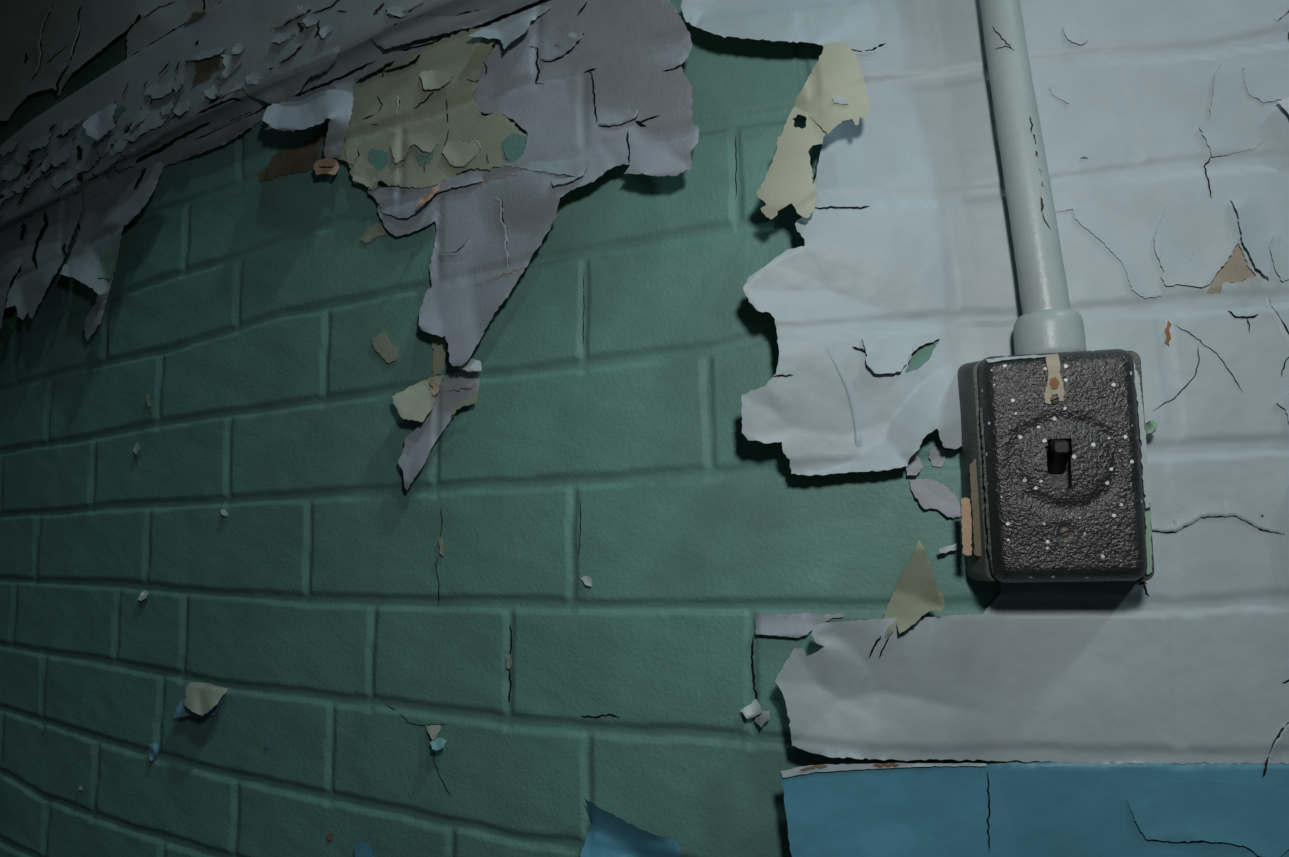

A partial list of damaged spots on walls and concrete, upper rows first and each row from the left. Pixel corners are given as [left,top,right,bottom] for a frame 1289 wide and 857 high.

crack [1030,117,1050,228]
crack [1203,157,1212,196]
peeling [0,0,1023,518]
crack [1152,324,1243,412]
crack [1229,295,1289,377]
peeling [754,0,1289,857]
crack [1151,499,1285,535]
peeling [172,682,228,718]
crack [1263,722,1289,777]
peeling [580,799,681,857]
crack [985,773,993,853]
crack [1146,839,1288,857]